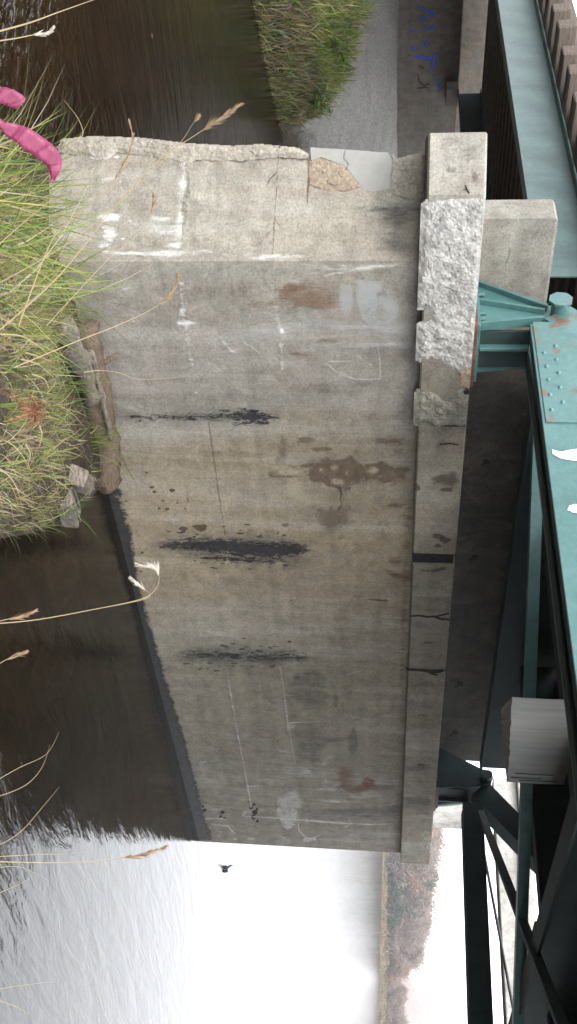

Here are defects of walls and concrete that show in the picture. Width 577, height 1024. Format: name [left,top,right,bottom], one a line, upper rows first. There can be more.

spalling [58,136,360,242]
damp [98,211,183,256]
spalling [390,152,485,427]
damp [126,408,279,426]
damp [160,523,309,570]
crack [410,613,449,621]
damp [183,638,309,672]
crack [406,667,443,676]